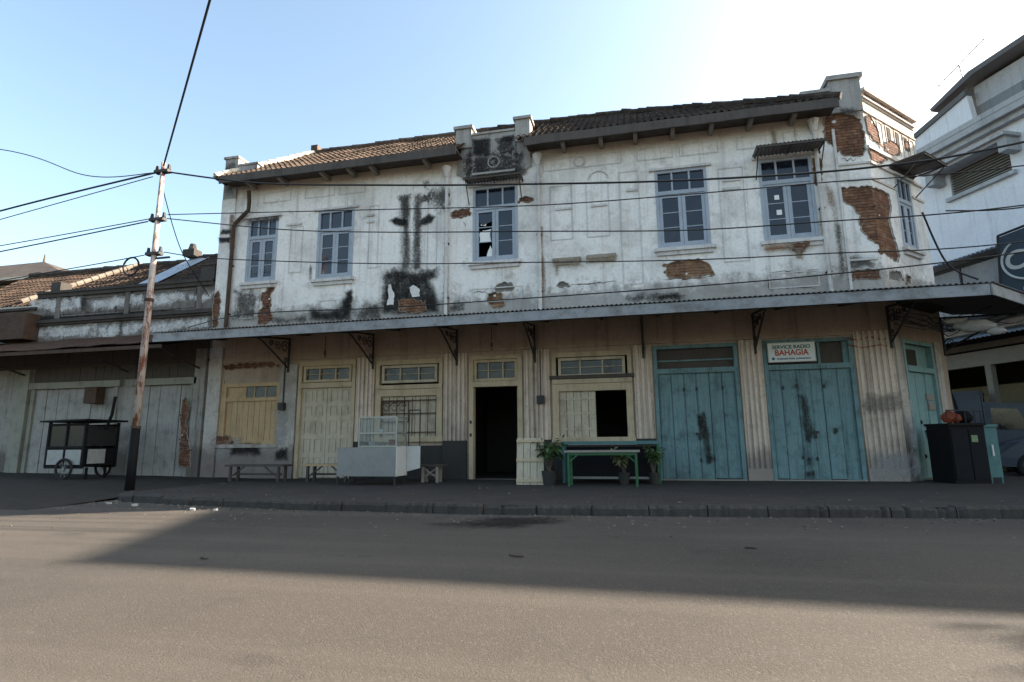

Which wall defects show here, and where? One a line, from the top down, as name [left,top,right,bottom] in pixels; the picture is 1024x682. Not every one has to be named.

mould [463,135,527,177]
spalling [822,113,911,164]
spalling [450,208,472,219]
damp [274,182,464,324]
spalling [662,258,715,280]
spalling [790,241,810,259]
spalling [841,185,911,285]
peeling [30,290,222,339]
spalling [257,286,276,325]
spalling [486,281,514,309]
spalling [178,397,192,468]